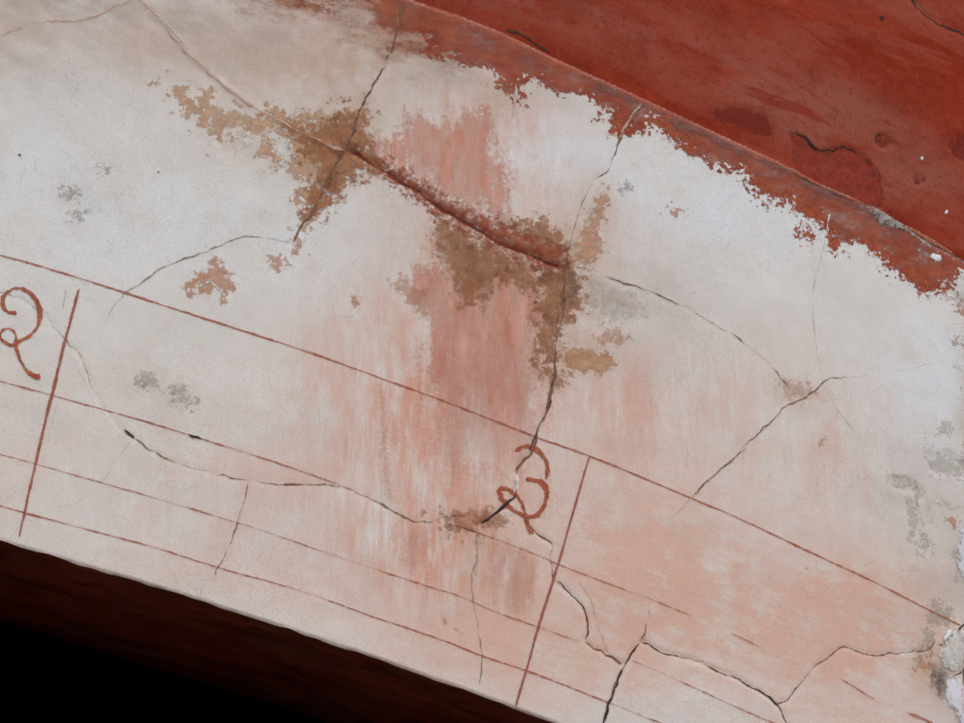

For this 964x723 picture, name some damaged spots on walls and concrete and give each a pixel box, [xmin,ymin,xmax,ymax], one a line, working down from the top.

peeling [182,257,236,305]
peeling [166,85,383,206]
peeling [268,218,314,273]
crack [51,0,677,602]
leakage [370,107,513,229]
leakage [398,246,588,408]
peeling [275,0,964,316]
crack [769,159,964,261]
crack [694,371,838,495]
leakage [440,506,506,532]
crack [532,529,934,723]
spalling [936,624,964,723]